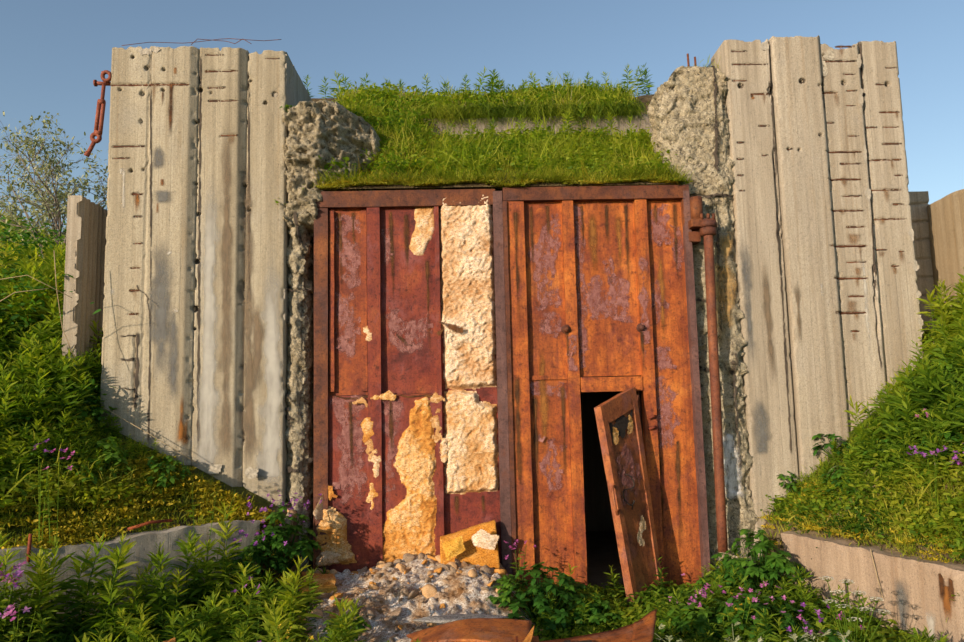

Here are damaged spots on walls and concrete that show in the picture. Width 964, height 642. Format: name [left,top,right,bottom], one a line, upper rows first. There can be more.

peeling [329,214,361,357]
corrosion [389,212,409,275]
peeling [528,204,685,448]
corrosion [178,403,187,443]
peeling [330,395,367,504]
peeling [381,400,403,503]
corrosion [532,358,547,466]
corrosion [938,573,954,614]